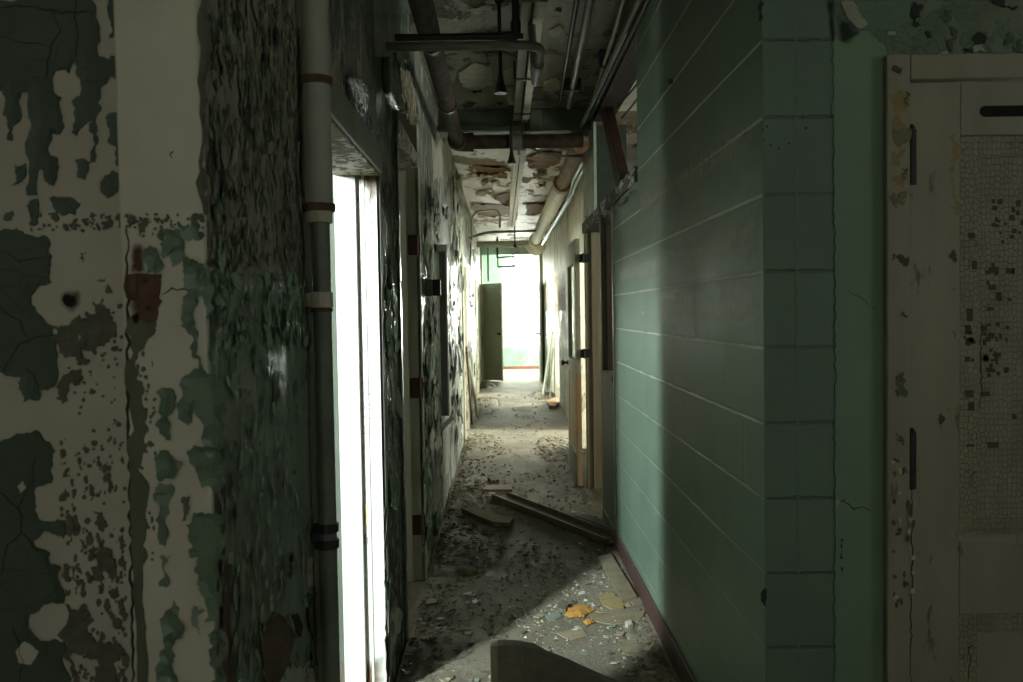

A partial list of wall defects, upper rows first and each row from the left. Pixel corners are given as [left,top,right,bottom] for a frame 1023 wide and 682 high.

peeling [834,0,1023,75]
peeling [458,62,516,109]
peeling [526,152,561,188]
corrosion [131,245,143,272]
peeling [0,0,252,682]
peeling [263,271,309,353]
peeling [421,131,545,560]
crack [765,3,876,681]
crack [977,321,985,409]
flaking render [280,593,319,682]